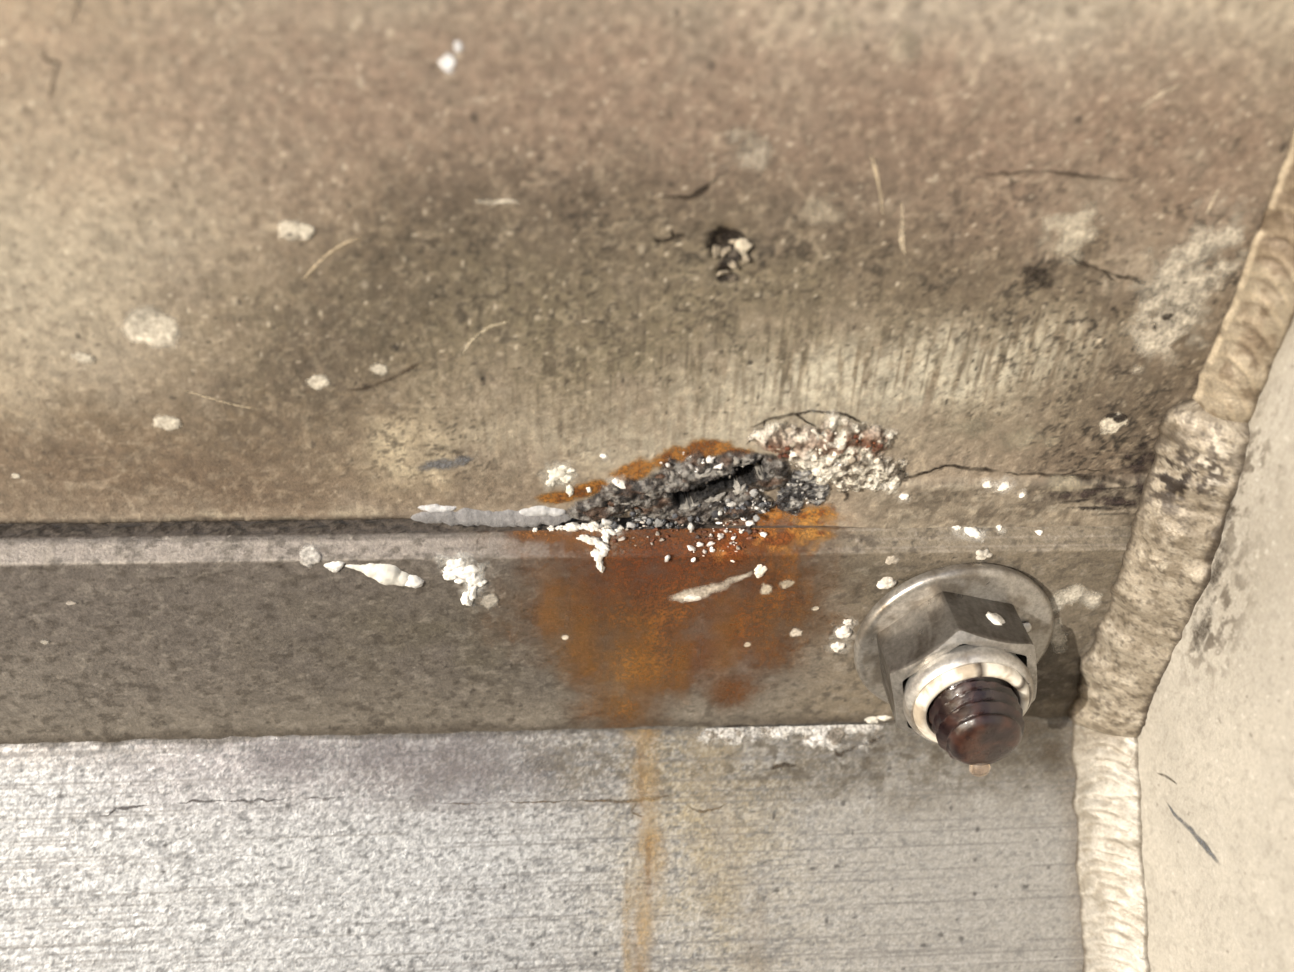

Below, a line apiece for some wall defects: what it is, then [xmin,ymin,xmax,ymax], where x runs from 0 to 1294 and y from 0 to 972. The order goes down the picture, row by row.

crack [747,410,871,443]
peeling [545,465,592,497]
corrosion [514,413,908,738]